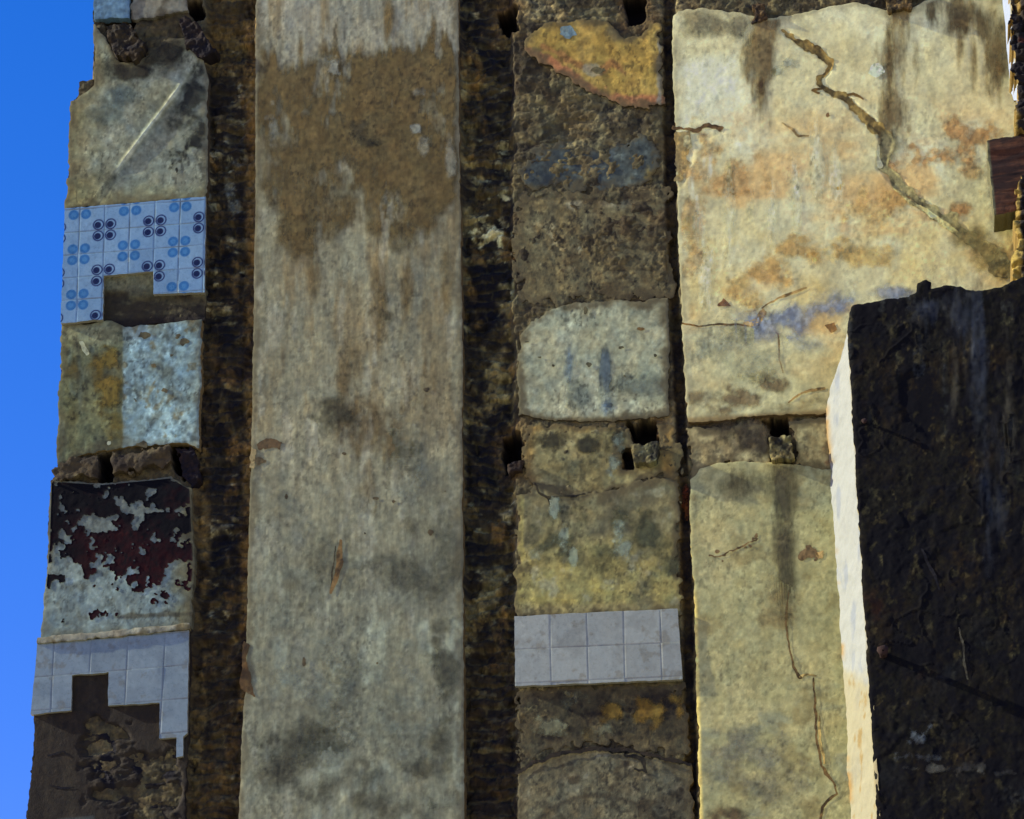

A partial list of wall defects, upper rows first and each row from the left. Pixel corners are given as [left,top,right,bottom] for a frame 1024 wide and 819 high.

leakage [686,12,778,110]
leakage [879,11,909,141]
leakage [927,0,1008,95]
leakage [258,2,457,282]
crack [781,29,1011,278]
peeling [47,479,192,604]
crack [706,533,758,563]
leakage [772,466,794,599]
peeling [89,609,118,620]
crack [785,590,838,819]